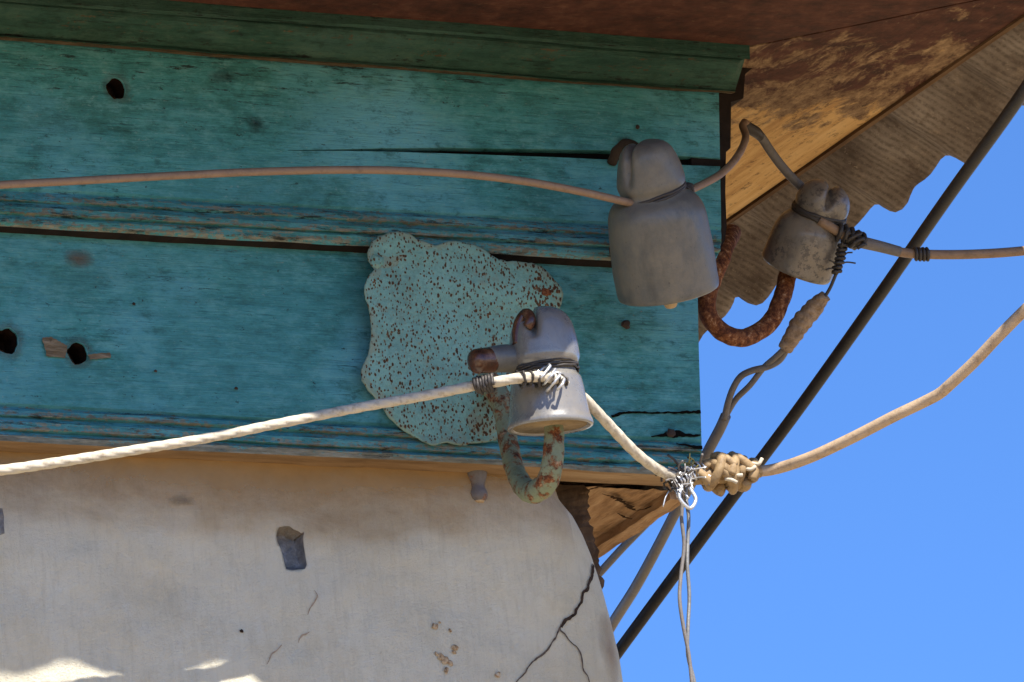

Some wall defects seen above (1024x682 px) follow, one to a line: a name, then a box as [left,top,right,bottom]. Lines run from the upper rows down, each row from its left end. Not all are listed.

crack [516,565,595,682]